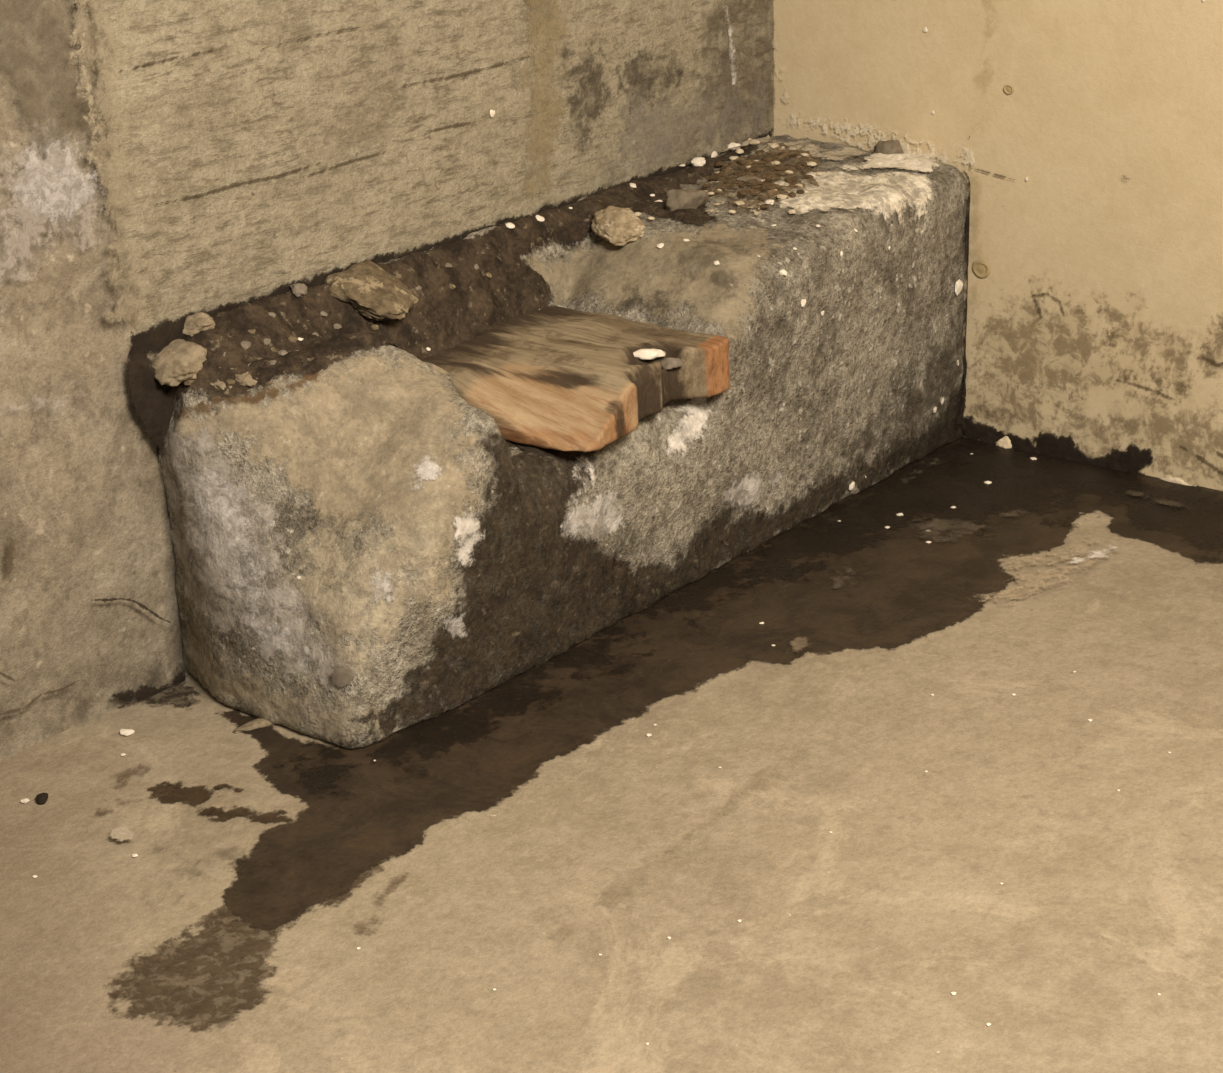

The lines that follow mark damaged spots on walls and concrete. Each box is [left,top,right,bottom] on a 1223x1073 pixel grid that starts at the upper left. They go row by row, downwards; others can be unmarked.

damp [109,276,1223,1032]